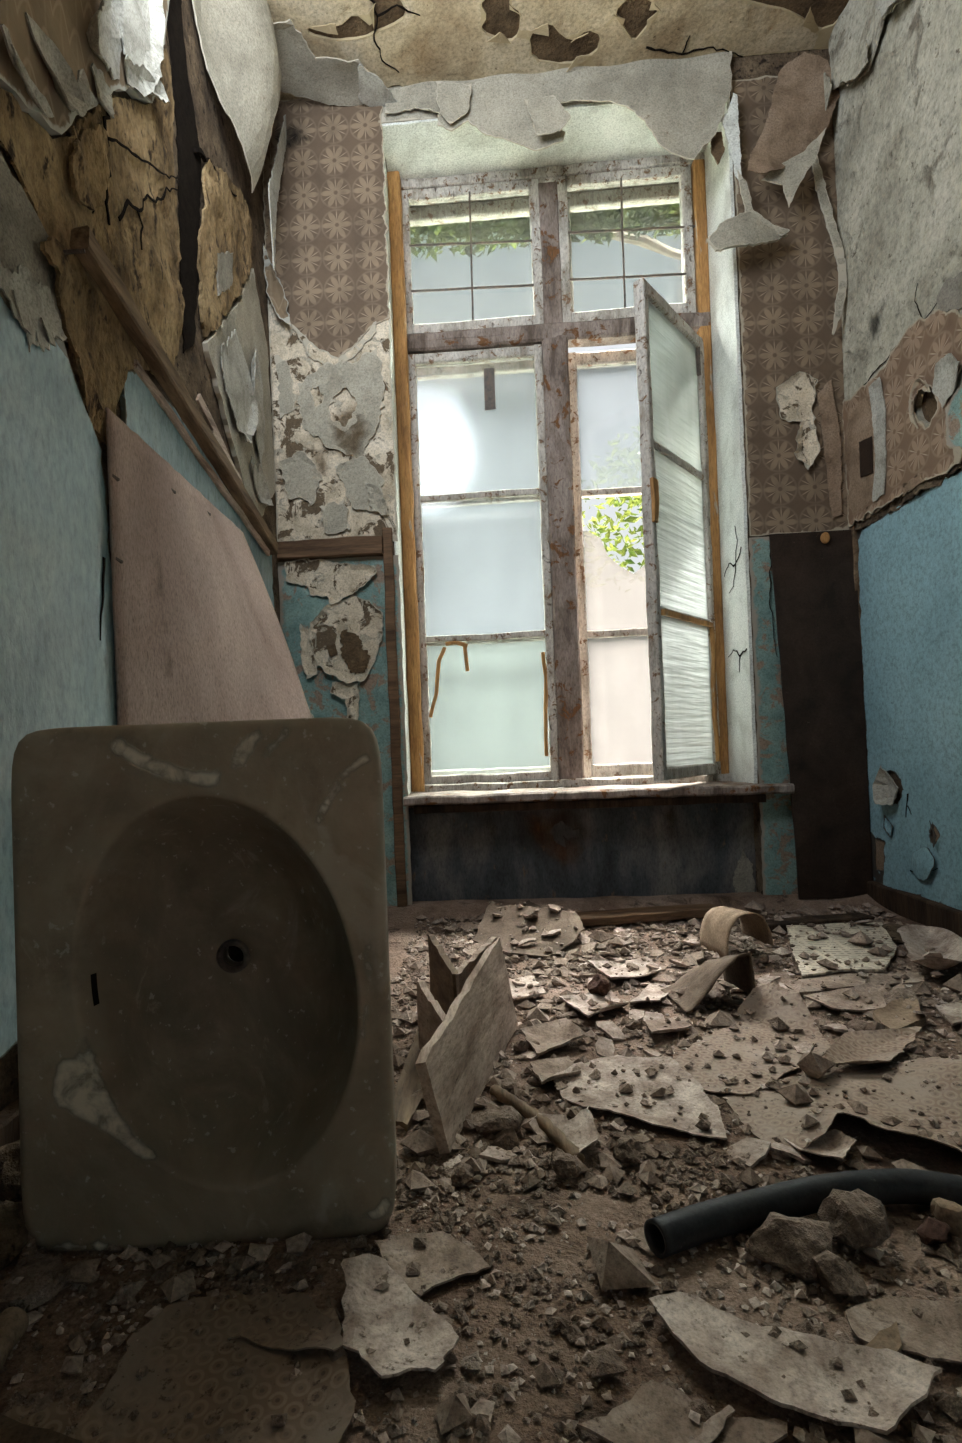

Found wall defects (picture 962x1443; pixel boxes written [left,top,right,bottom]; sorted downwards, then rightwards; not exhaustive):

flaking render [273,0,732,160]
flaking render [752,0,849,35]
flaking render [0,0,388,534]
flaking render [936,272,962,312]
flaking render [854,378,962,531]
peeling [285,558,384,720]
peeling [872,765,898,871]